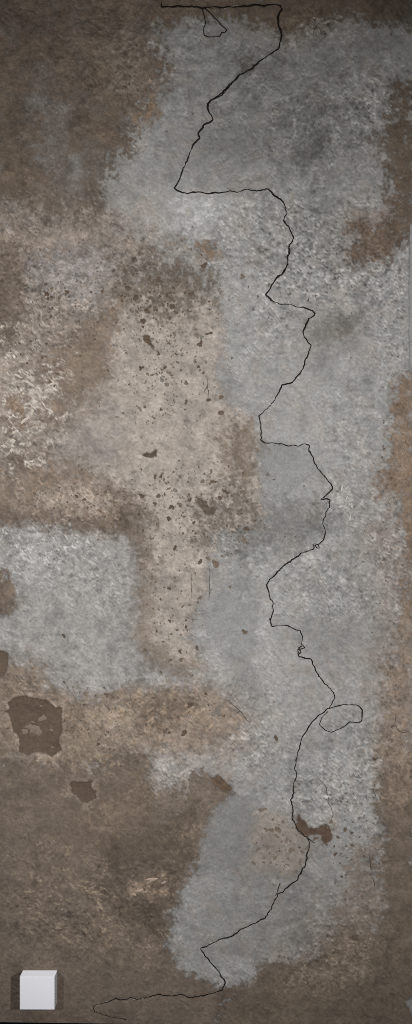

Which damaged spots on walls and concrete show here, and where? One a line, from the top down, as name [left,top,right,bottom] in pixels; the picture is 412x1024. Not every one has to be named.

peeling [23,269,316,754]
crack [93,3,363,1020]
spalling [0,689,66,768]
spalling [64,779,100,810]
spalling [252,814,362,878]